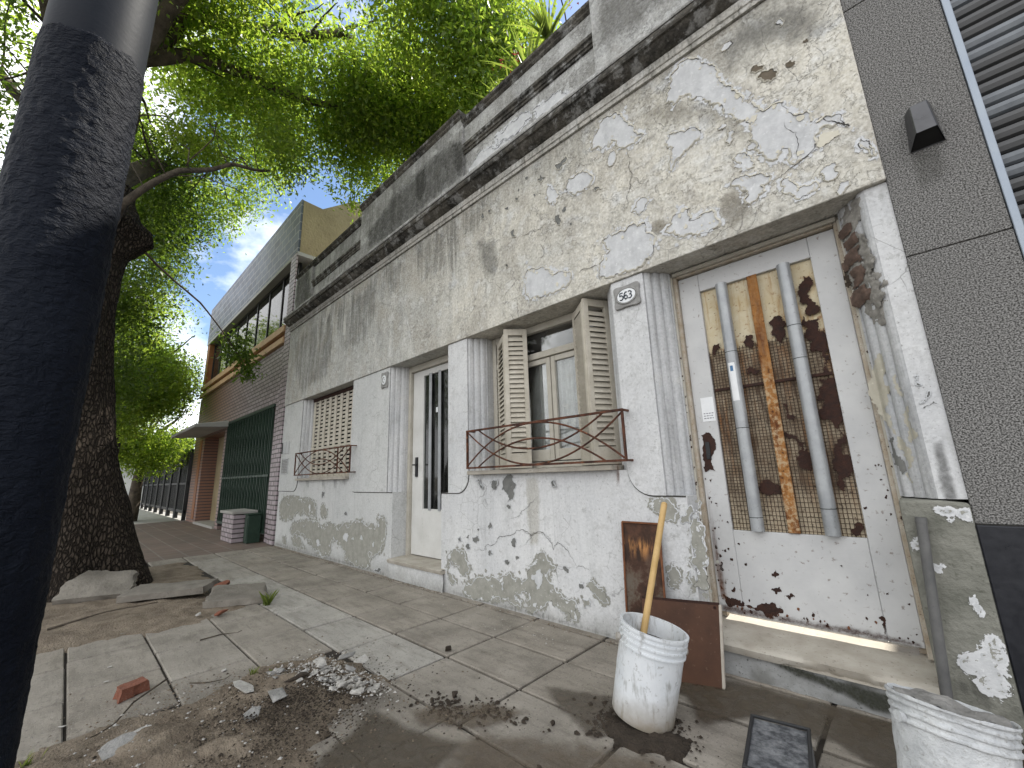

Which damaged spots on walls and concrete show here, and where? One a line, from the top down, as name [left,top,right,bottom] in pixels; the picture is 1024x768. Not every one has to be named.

peeling [589,105,648,167]
peeling [505,155,601,226]
peeling [664,40,888,326]
peeling [595,196,726,281]
peeling [522,261,574,303]
rust [769,315,786,345]
rust [758,479,781,495]
rust [784,432,812,471]
peeling [279,491,388,573]
peeling [444,523,610,644]
crack [483,496,582,568]
peeling [645,497,719,599]